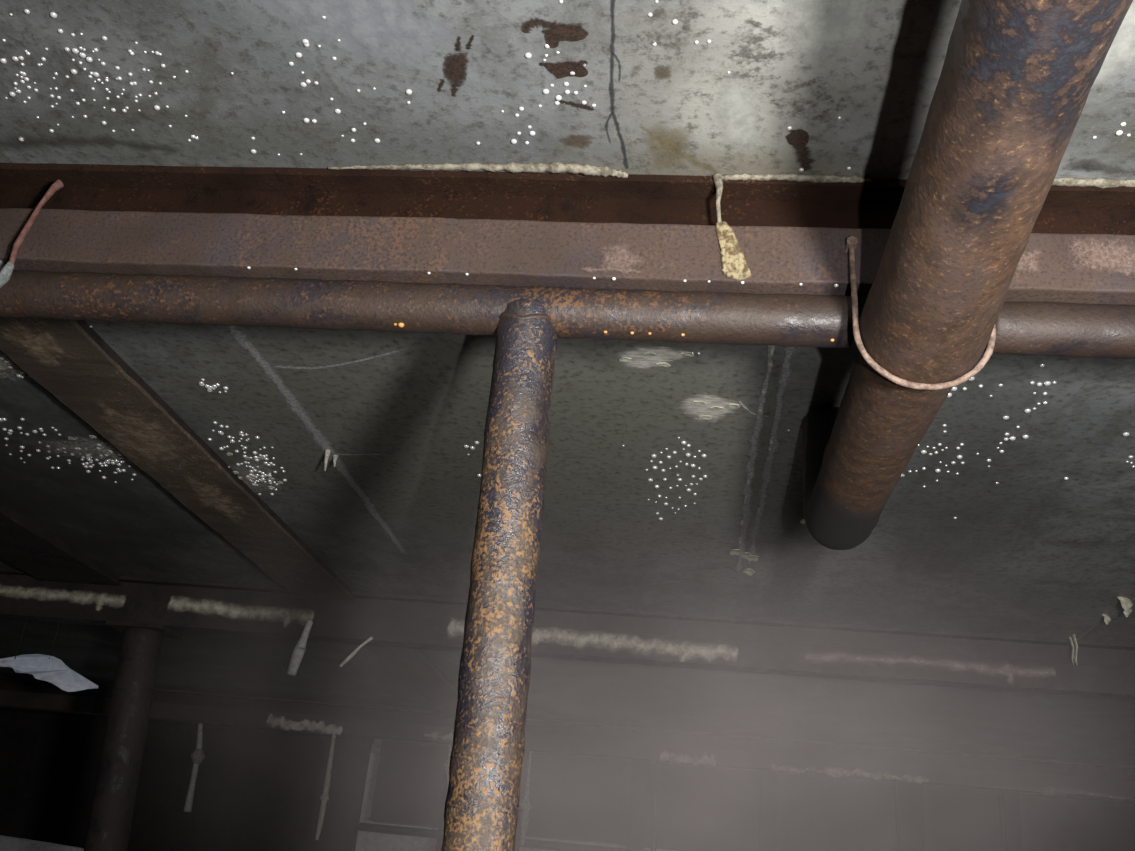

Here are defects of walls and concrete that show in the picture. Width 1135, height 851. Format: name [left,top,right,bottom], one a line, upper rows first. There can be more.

crack [606,0,629,168]
leakage [712,173,872,279]
rust [1075,243,1135,273]
leakage [729,345,795,576]
peeling [1069,597,1135,665]